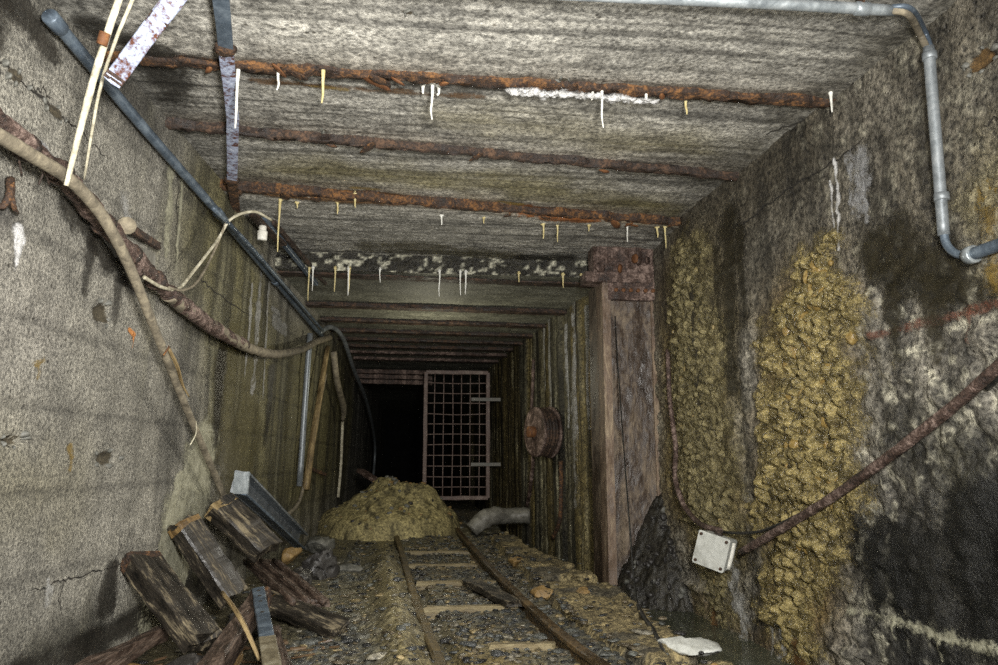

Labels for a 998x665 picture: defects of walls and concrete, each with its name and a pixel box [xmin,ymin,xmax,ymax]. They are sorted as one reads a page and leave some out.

rust [251,63,484,99]
rust [267,187,398,206]
rust [497,201,639,228]
leakage [847,485,998,664]